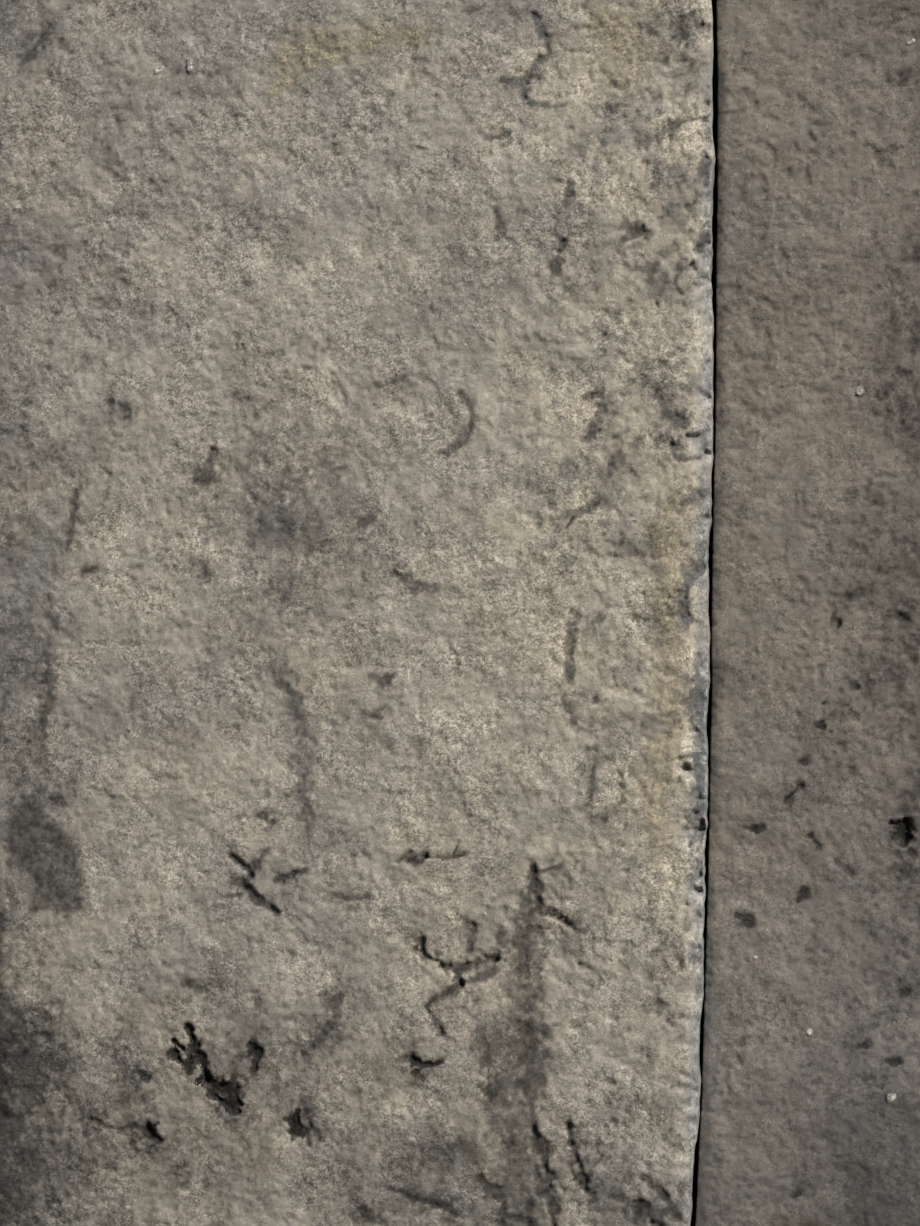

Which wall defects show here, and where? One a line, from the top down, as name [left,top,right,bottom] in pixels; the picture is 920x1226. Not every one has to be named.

crack [500,14,566,108]
crack [484,131,511,140]
crack [444,390,474,457]
water stain [9,788,84,911]
crack [229,851,306,916]
crack [414,923,498,1036]
water stain [480,864,547,1178]